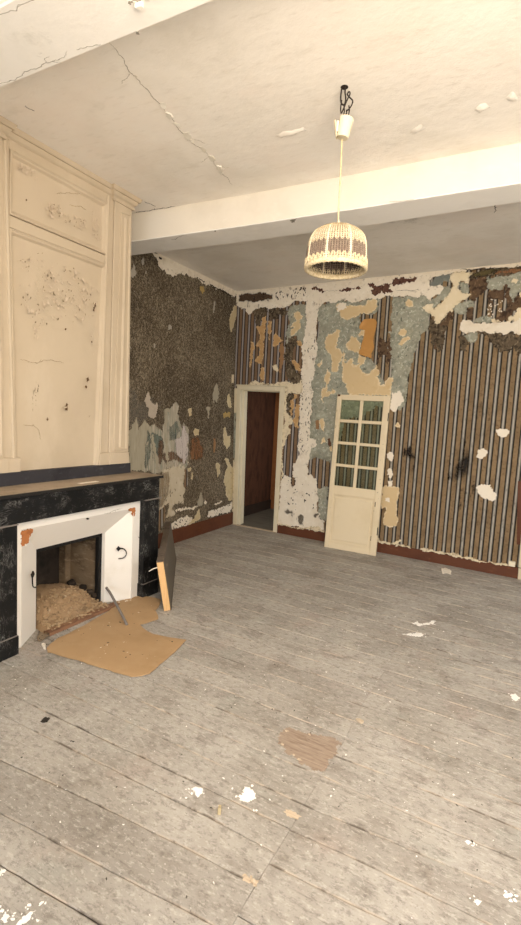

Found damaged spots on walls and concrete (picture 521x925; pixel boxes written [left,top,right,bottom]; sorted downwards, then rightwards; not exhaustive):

crack [0,42,232,185]
flaking render [128,253,521,533]